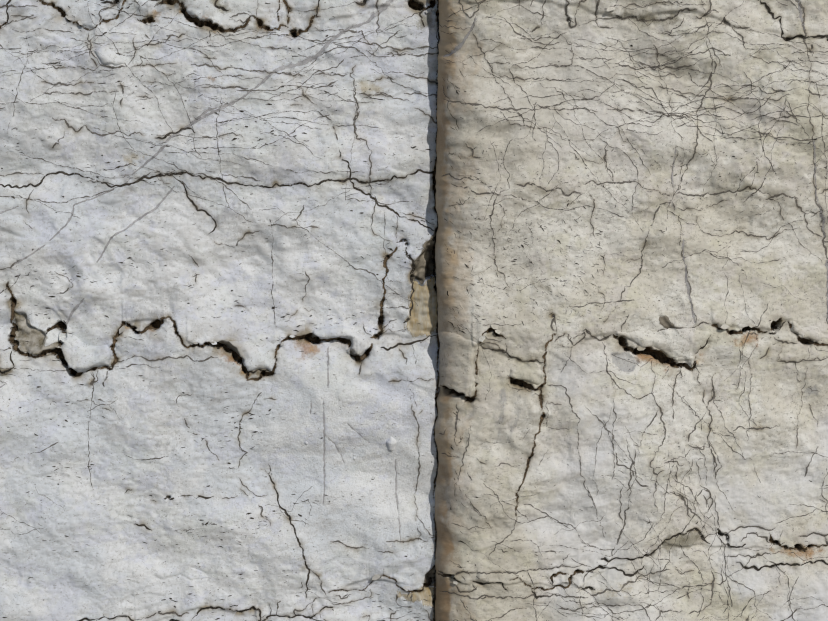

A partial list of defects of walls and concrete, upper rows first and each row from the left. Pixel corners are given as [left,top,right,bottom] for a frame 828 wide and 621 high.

crack [0,0,828,339]
spalling [14,311,59,356]
peeling [404,233,438,337]
spalling [659,316,675,329]
crack [77,369,116,485]
crack [381,304,470,559]
crack [153,393,342,617]
crack [419,570,440,621]